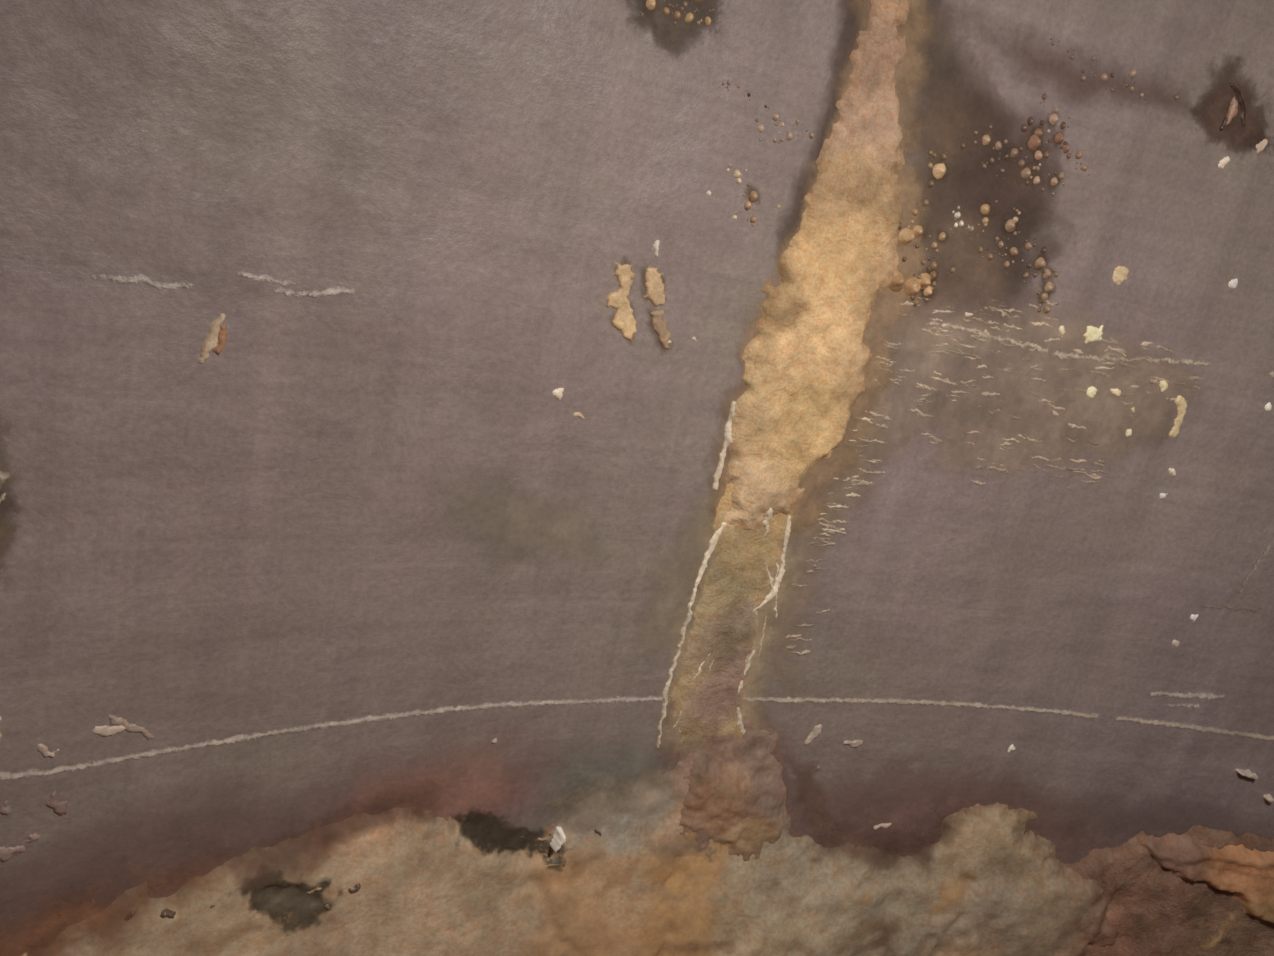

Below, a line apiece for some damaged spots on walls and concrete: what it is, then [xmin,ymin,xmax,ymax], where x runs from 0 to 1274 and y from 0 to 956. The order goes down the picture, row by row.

rust [622,0,718,53]
peeling [606,240,672,350]
rust [656,0,1091,748]
peeling [804,724,822,745]
peeling [843,739,863,747]
peeling [1235,768,1258,780]
crack [456,812,564,870]
peeling [550,826,566,852]
rust [0,751,1274,956]
crack [243,866,331,931]